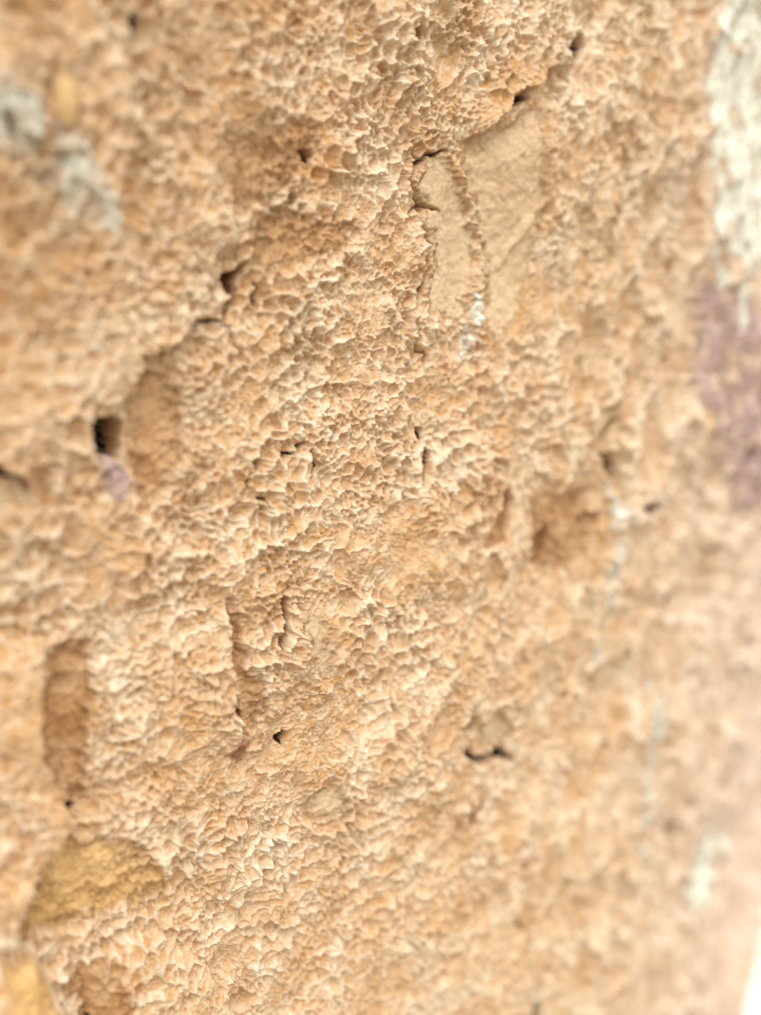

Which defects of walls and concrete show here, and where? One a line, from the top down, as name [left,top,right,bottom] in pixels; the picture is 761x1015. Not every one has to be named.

crack [0,467,24,488]